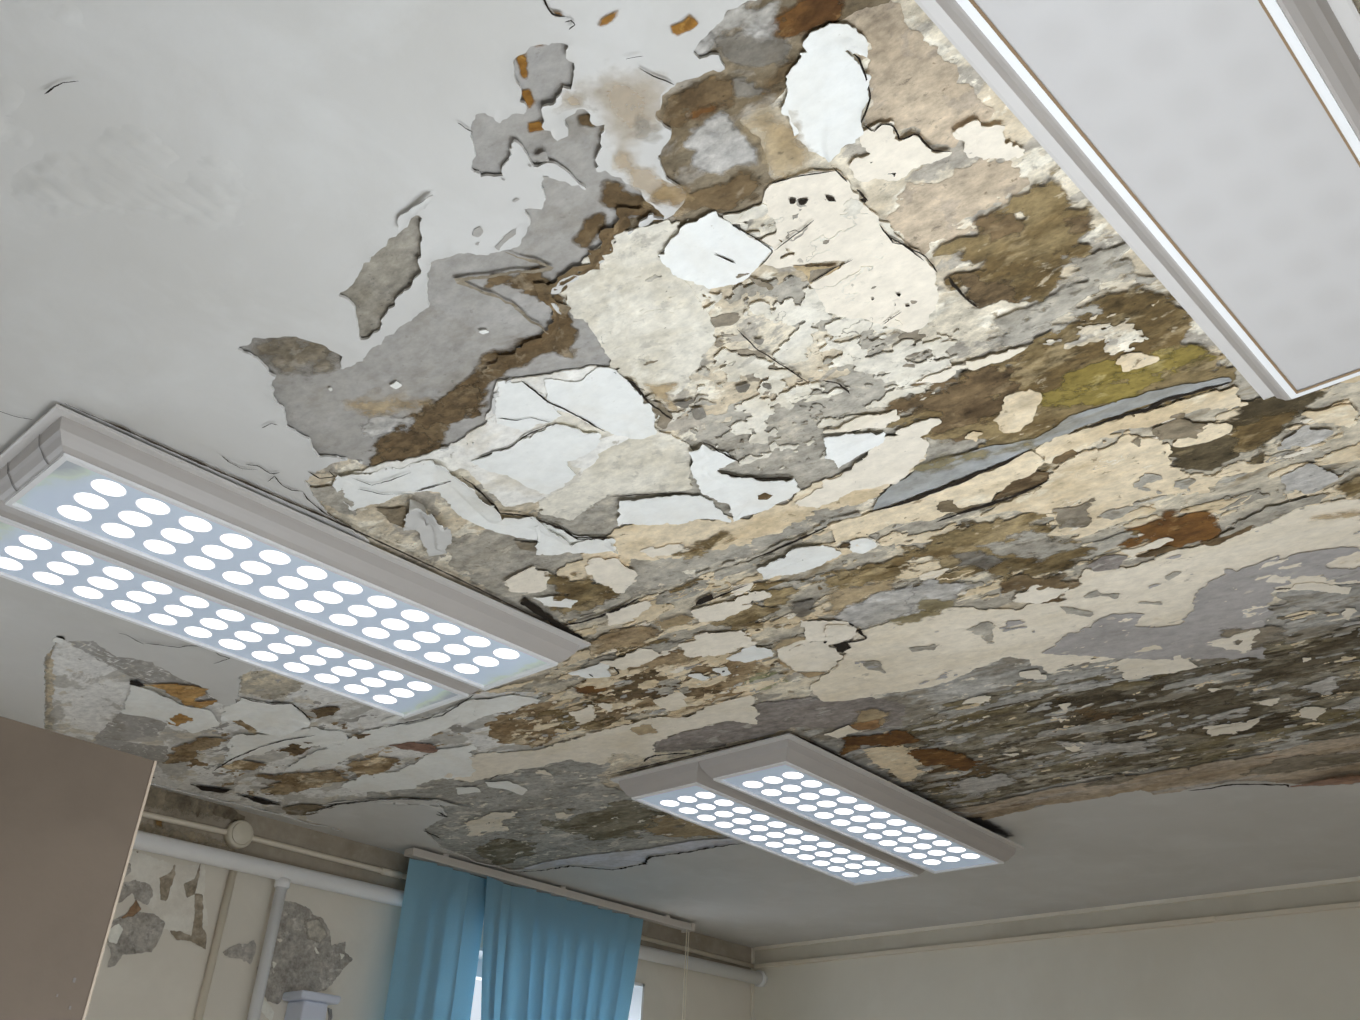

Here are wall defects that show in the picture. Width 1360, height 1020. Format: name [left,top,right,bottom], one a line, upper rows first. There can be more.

peeling [340,195,433,338]
peeling [840,266,874,294]
damp [885,167,1237,463]
peeling [1180,313,1234,373]
damp [1164,375,1360,471]
crack [561,598,639,626]
crack [692,382,1248,608]
damp [819,464,1360,625]
spalling [1266,575,1291,583]
peeling [145,787,245,821]
peeling [107,851,208,967]
peeling [223,901,353,1020]